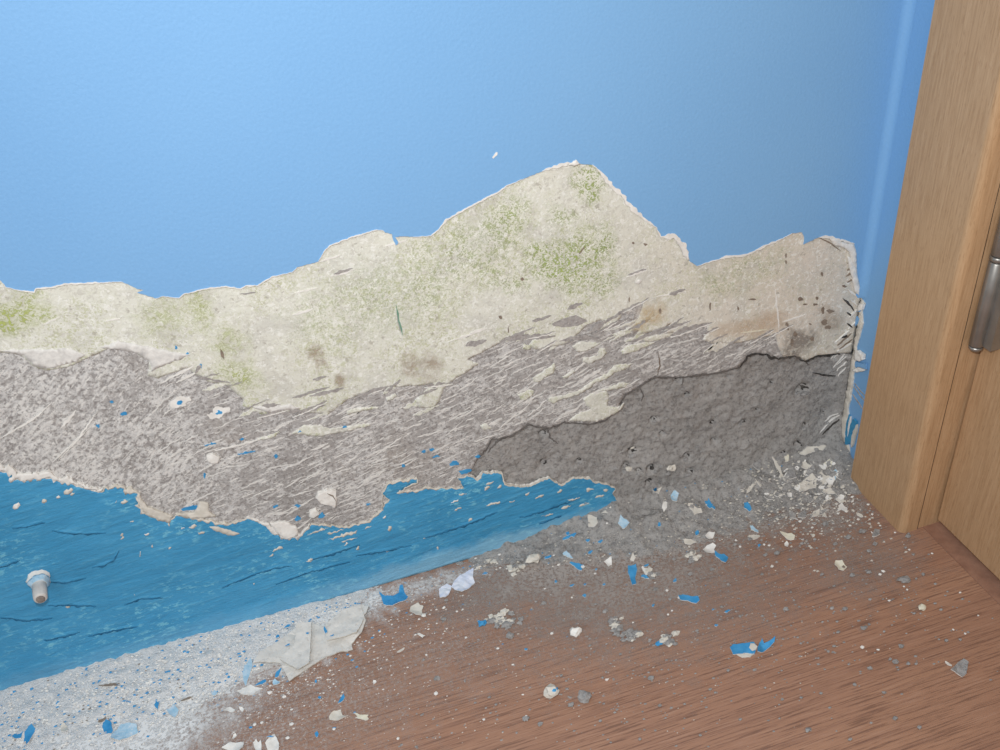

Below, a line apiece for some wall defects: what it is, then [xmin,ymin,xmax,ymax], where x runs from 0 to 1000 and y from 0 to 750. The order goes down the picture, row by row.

leakage [579,167,599,201]
leakage [0,296,49,332]
peeling [0,160,867,557]
leakage [141,321,810,529]
leakage [534,235,611,293]
crack [479,353,841,458]
crack [0,520,163,641]